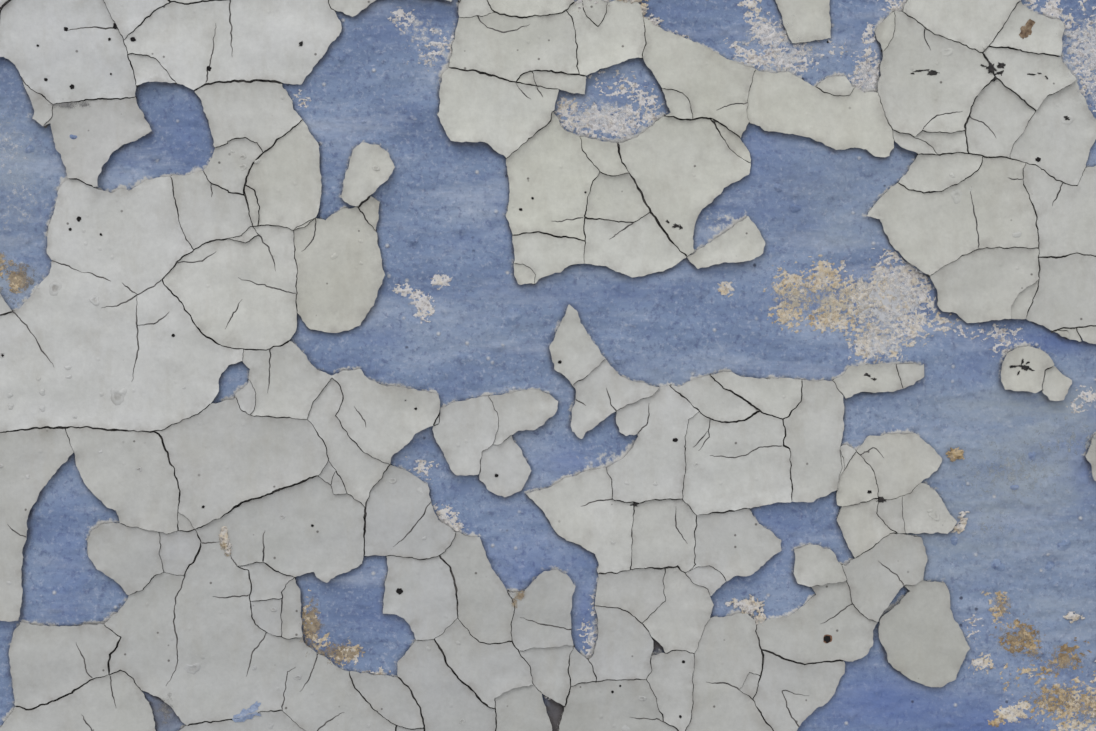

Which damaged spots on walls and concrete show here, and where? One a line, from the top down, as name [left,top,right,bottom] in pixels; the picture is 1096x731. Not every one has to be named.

crack [23,0,282,128]
crack [449,0,607,159]
crack [661,71,755,163]
crack [880,2,1096,313]
peeling [0,0,714,731]
crack [0,119,843,731]
peeling [686,433,970,731]
crack [821,447,910,624]
peeling [983,324,1072,401]
spalling [968,591,1096,731]
spalling [1066,385,1096,414]
peeling [1085,435,1096,481]